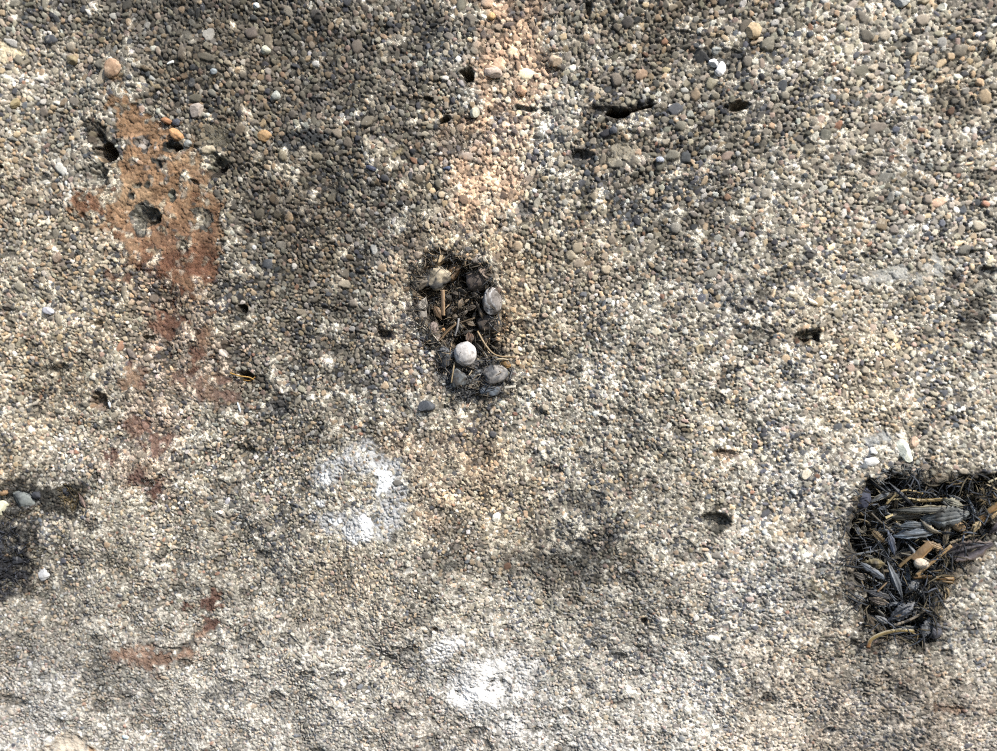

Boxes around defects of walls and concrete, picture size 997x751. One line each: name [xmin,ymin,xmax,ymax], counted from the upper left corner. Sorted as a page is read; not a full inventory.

corrosion [66,90,225,299]
spalling [408,248,507,360]
corrosion [149,305,190,340]
corrosion [117,360,147,390]
corrosion [173,328,241,404]
peeling [896,439,913,463]
water stain [374,464,394,496]
spalling [0,481,41,513]
spalling [57,483,83,515]
water stain [329,514,373,545]
spalling [844,447,997,652]